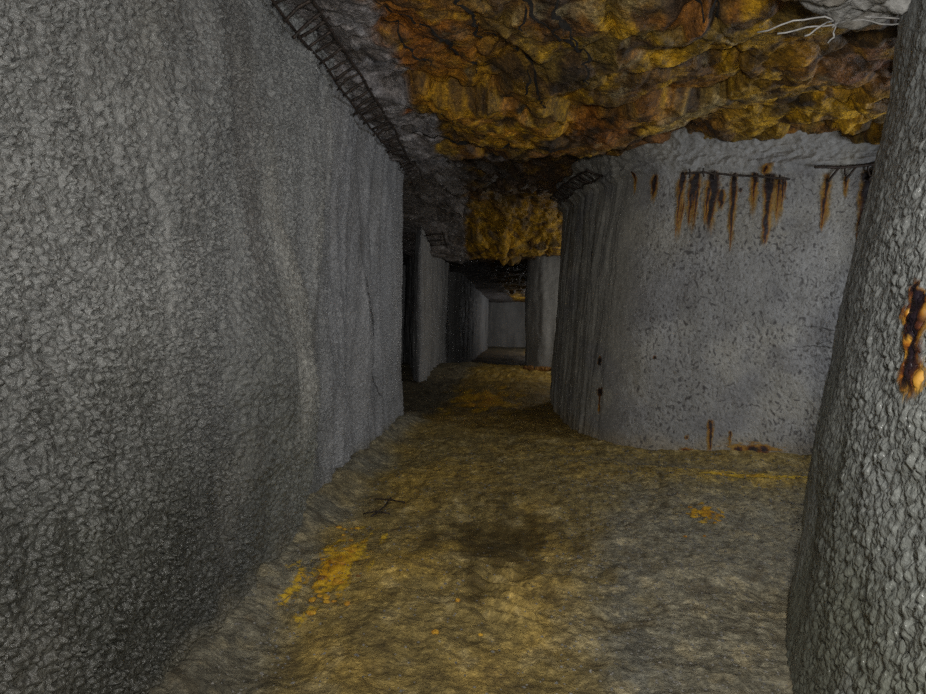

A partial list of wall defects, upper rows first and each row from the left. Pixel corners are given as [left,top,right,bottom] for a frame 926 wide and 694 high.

corrosion [675,163,787,247]
corrosion [820,174,831,230]
corrosion [857,171,872,234]
corrosion [898,281,926,396]
corrosion [728,431,781,453]